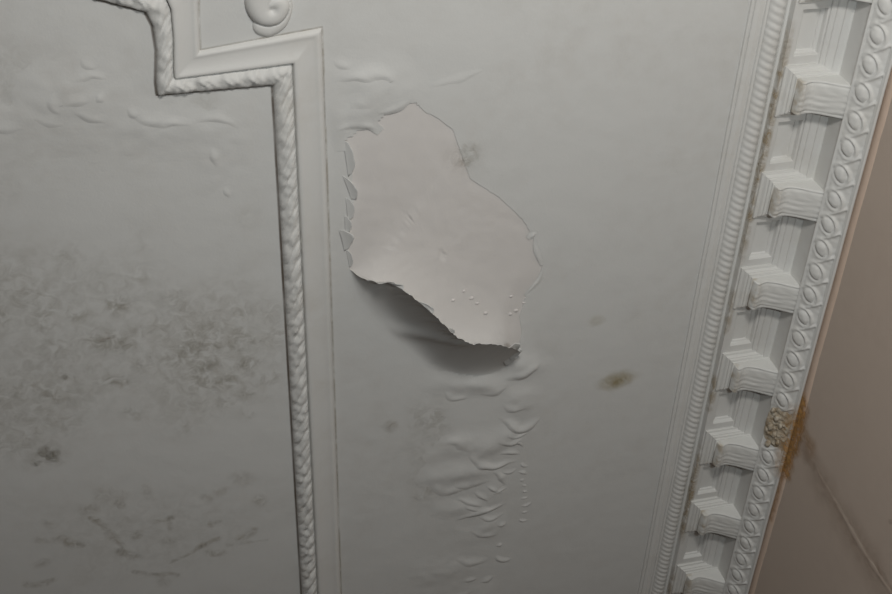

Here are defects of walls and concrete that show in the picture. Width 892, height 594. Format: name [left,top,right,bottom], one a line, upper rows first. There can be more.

peeling [339,103,547,377]